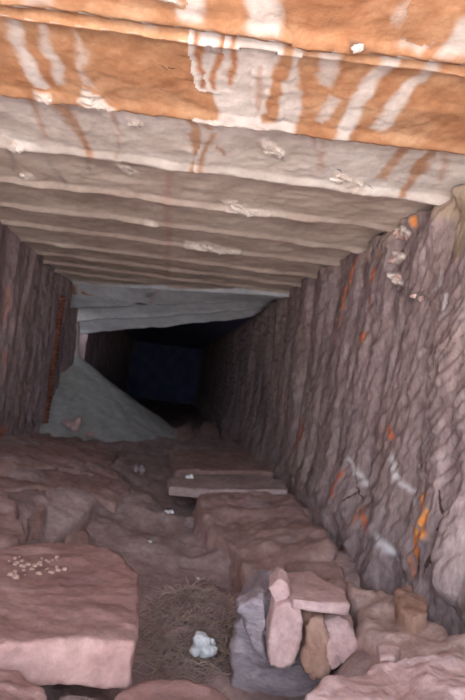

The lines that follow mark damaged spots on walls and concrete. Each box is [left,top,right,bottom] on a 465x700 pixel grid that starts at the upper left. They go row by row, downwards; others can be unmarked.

corrosion [0,0,465,201]
corrosion [403,487,435,587]